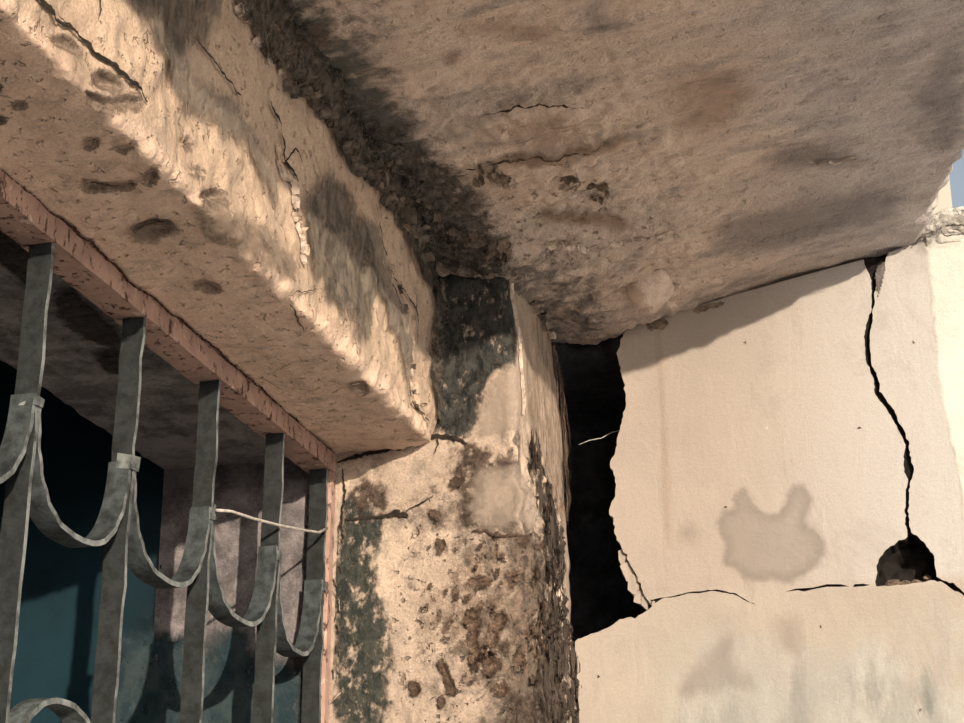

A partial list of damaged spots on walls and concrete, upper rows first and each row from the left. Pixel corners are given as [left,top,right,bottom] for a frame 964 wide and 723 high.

crack [40,0,148,102]
crack [474,103,584,121]
crack [458,145,603,173]
water stain [200,197,297,274]
water stain [303,9,518,525]
crack [863,254,914,536]
water stain [333,478,393,723]
crack [794,584,866,592]